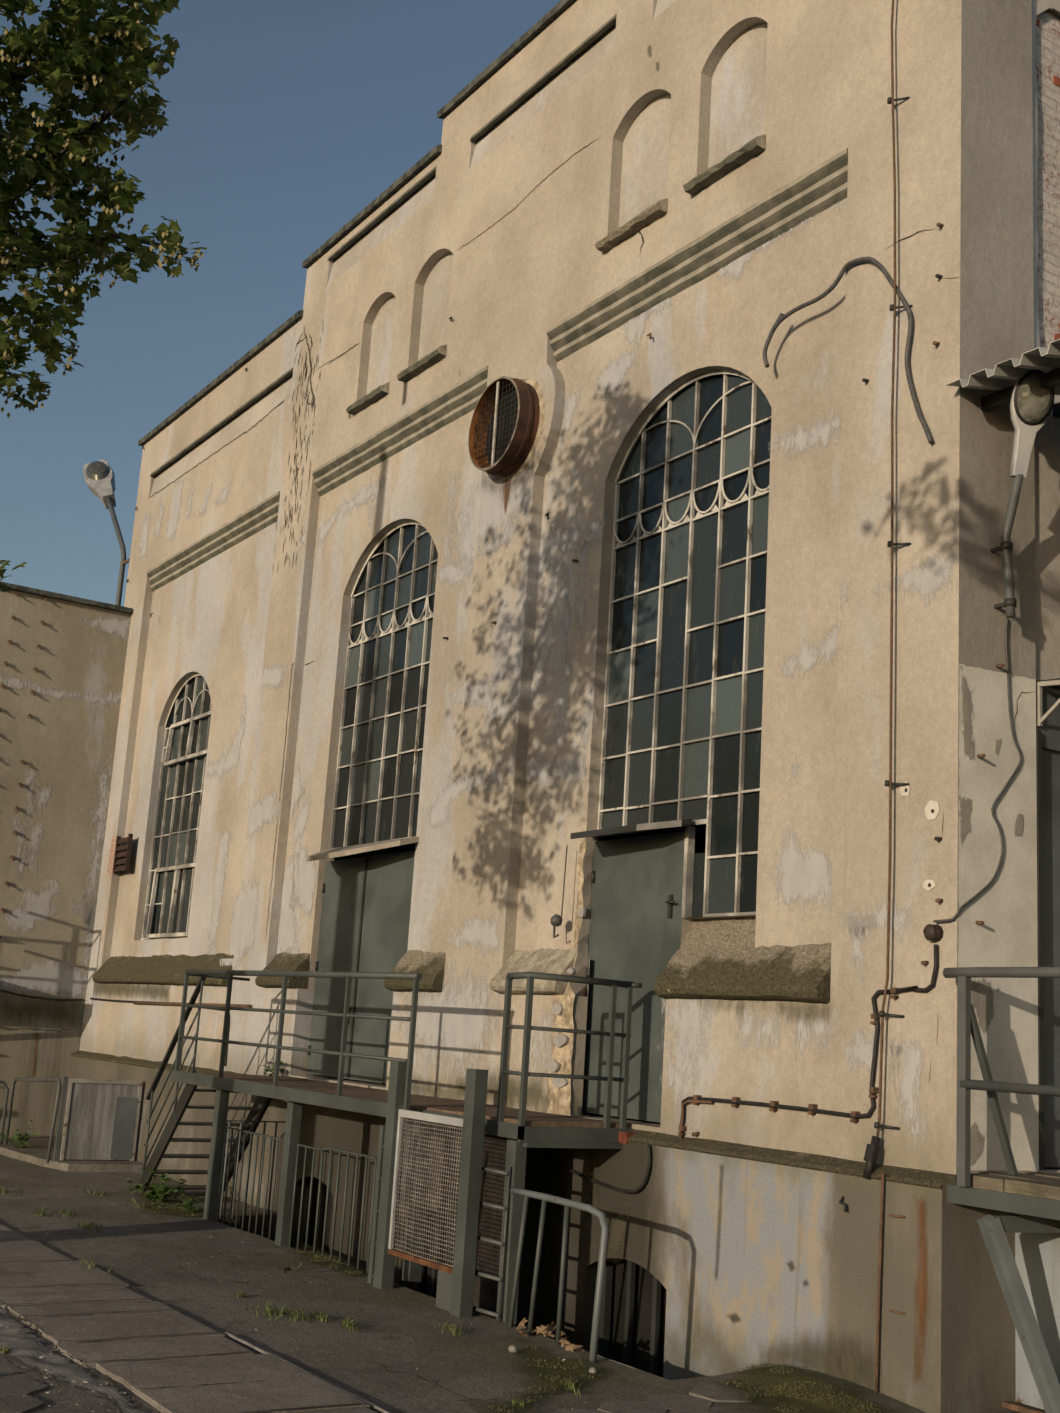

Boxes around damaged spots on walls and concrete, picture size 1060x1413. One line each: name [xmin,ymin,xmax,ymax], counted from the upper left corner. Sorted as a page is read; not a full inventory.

crack [455,138,599,251]
flaking render [1035,8,1060,348]
peeling [85,616,129,641]
peeling [0,673,122,705]
peeling [960,666,975,759]
peeling [958,796,972,843]
peeling [1,767,117,998]
peeling [772,828,913,985]
peeling [971,978,1000,1033]
peeling [970,1122,985,1164]
rust [916,1202,926,1375]